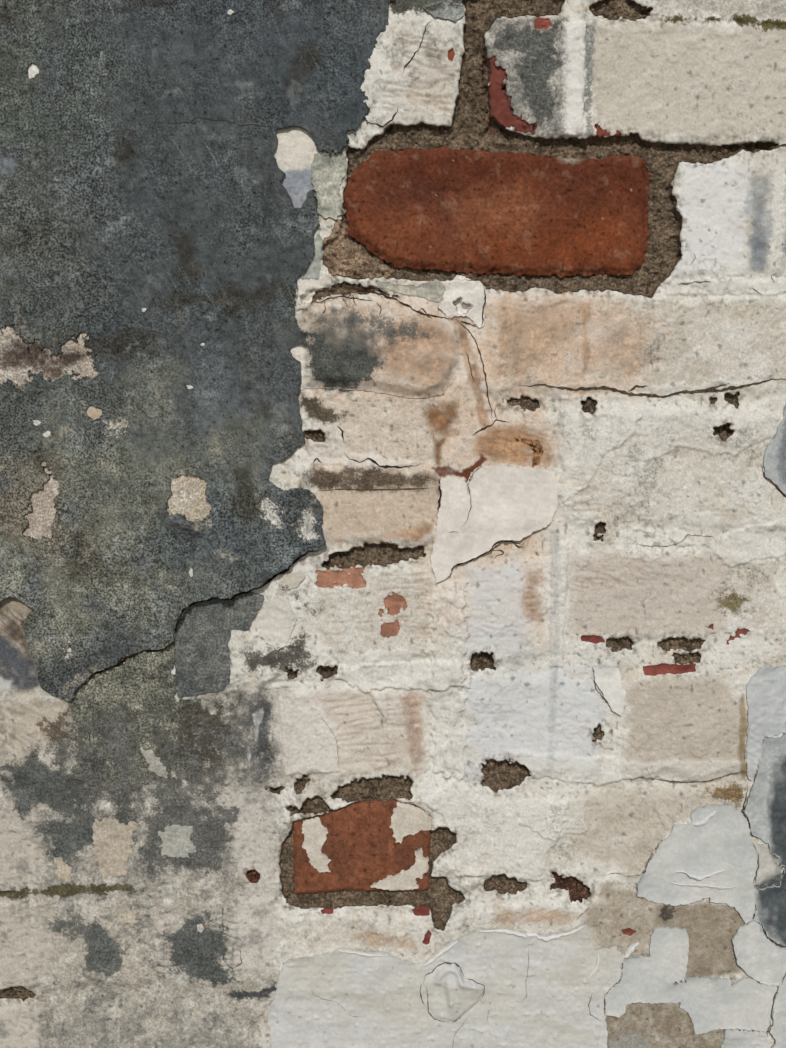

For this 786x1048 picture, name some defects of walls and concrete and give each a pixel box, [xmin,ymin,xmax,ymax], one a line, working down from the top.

peeling [0,0,779,796]
crack [312,285,506,435]
crack [518,378,786,398]
peeling [763,404,786,495]
crack [72,549,322,696]
peeling [265,665,786,1048]
spalling [0,986,35,1001]